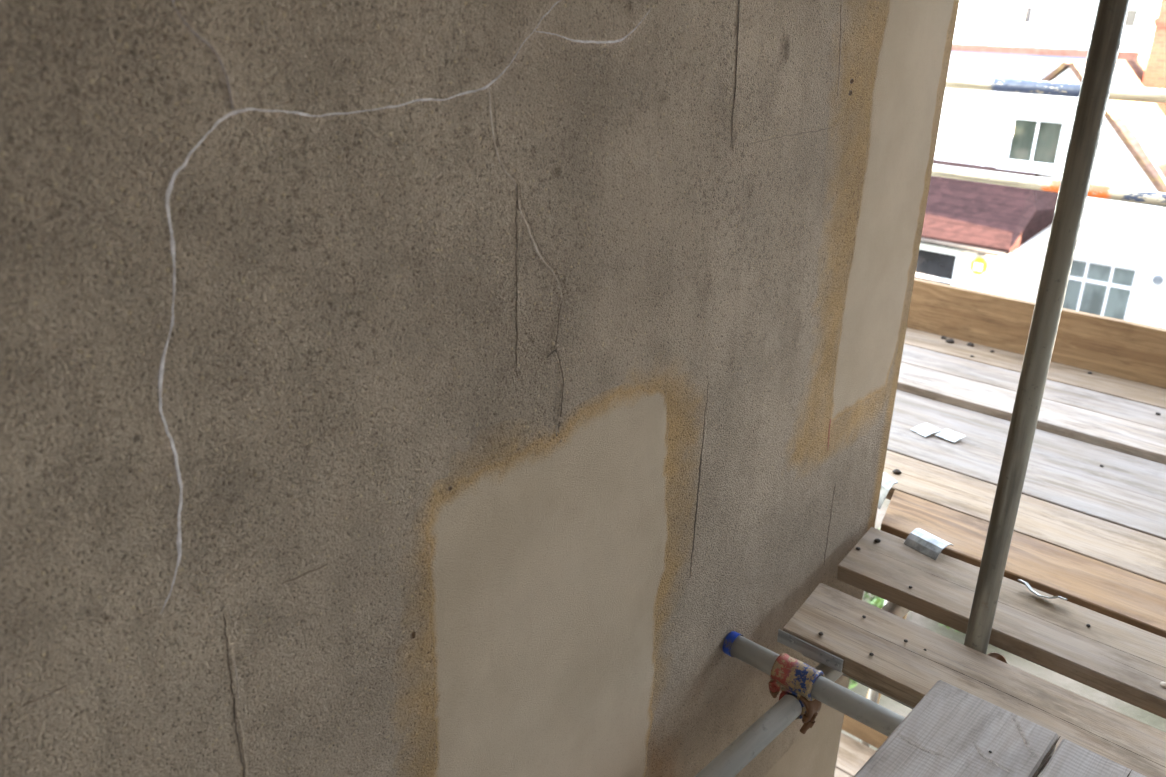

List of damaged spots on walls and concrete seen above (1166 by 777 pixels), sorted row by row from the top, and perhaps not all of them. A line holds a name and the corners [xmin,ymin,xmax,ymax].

crack [732,0,834,150]
crack [151,0,658,615]
crack [690,382,710,577]
crack [223,613,249,777]